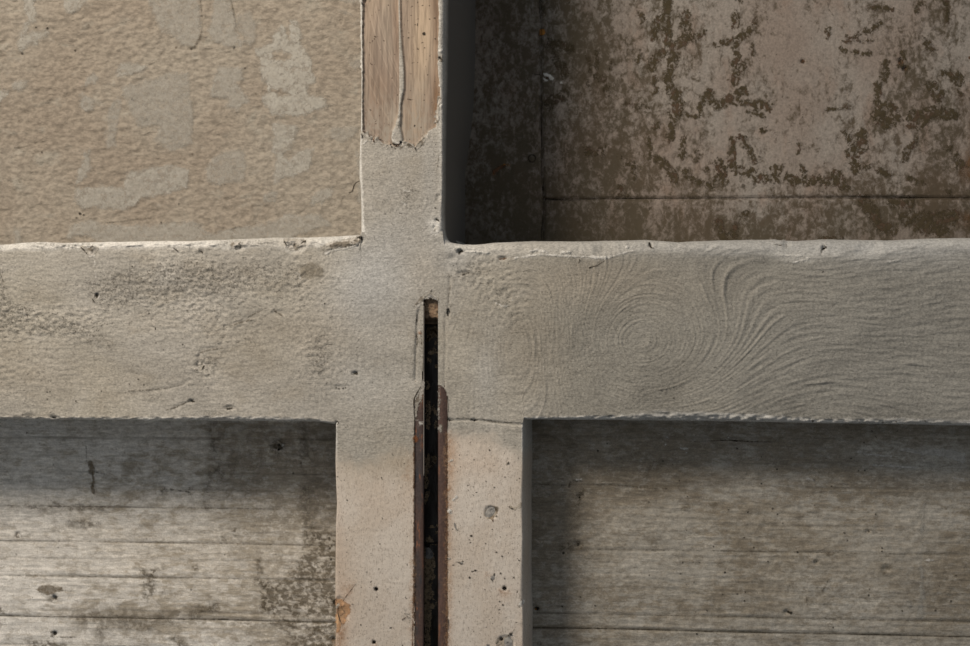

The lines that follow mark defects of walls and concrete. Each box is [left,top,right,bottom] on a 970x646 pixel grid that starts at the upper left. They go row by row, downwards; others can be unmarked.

damp [543,38,575,111]
damp [635,0,965,240]
mould [261,532,336,646]